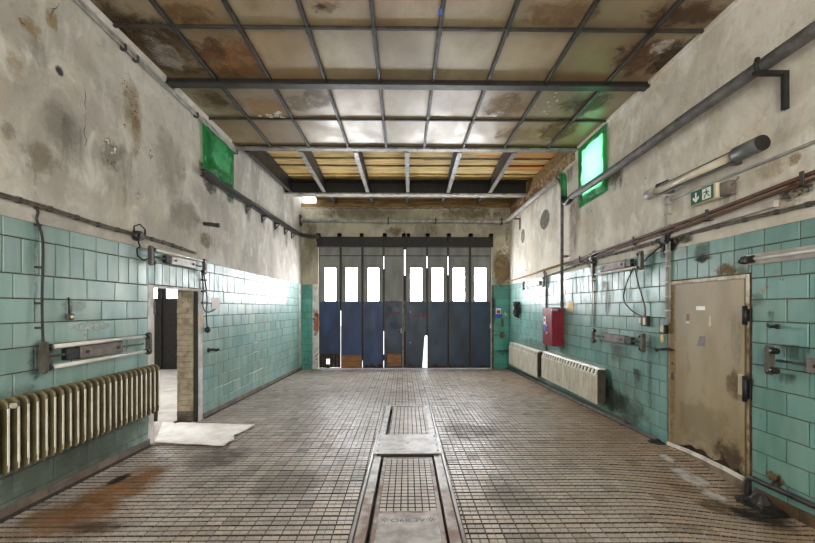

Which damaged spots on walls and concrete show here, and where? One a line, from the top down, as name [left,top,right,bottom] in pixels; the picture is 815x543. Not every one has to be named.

water stain [647,1,724,26]
water stain [100,2,199,73]
water stain [616,39,683,77]
water stain [605,377,643,424]
rust [65,469,162,518]